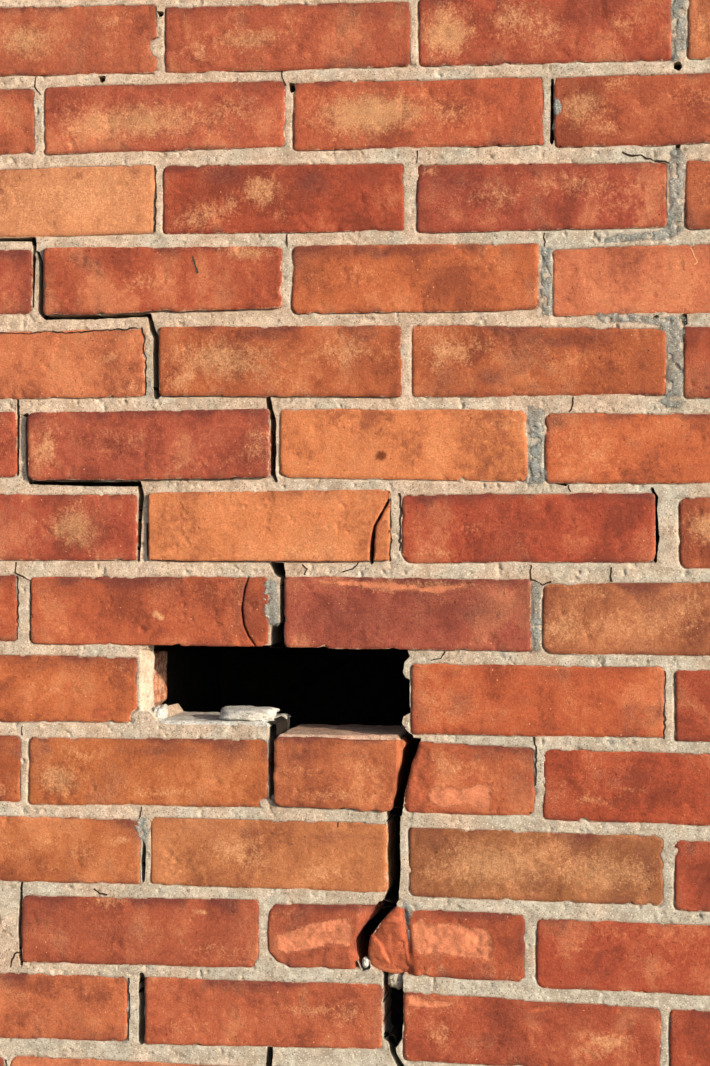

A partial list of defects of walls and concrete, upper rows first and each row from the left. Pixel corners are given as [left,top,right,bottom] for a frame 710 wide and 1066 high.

crack [0,314,159,399]
crack [30,481,143,522]
crack [342,491,402,573]
crack [14,562,32,640]
crack [256,563,308,648]
spalling [153,704,168,719]
crack [268,716,288,755]
crack [661,671,669,739]
crack [365,732,421,948]
crack [127,977,145,1041]
crack [383,987,404,1047]